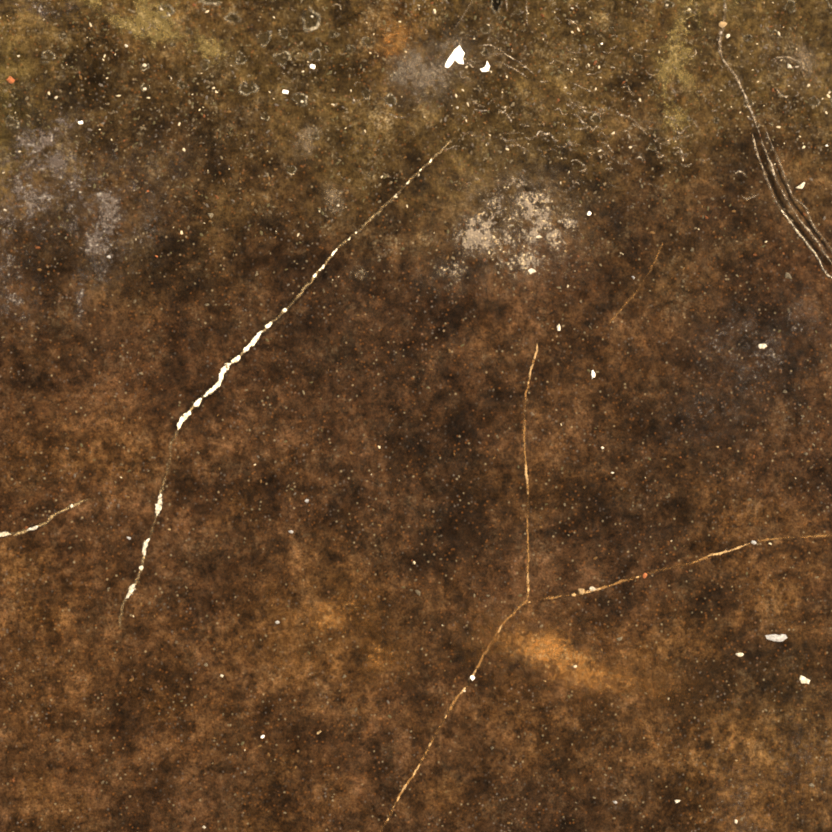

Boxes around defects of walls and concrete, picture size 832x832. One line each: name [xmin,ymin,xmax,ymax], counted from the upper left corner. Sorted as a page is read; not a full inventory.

crack [718,28,832,278]
water stain [441,172,581,285]
crack [169,141,450,446]
crack [523,345,538,494]
crack [0,500,84,537]
crack [119,538,150,624]
crack [155,478,165,516]
crack [686,534,830,564]
crack [386,516,667,822]